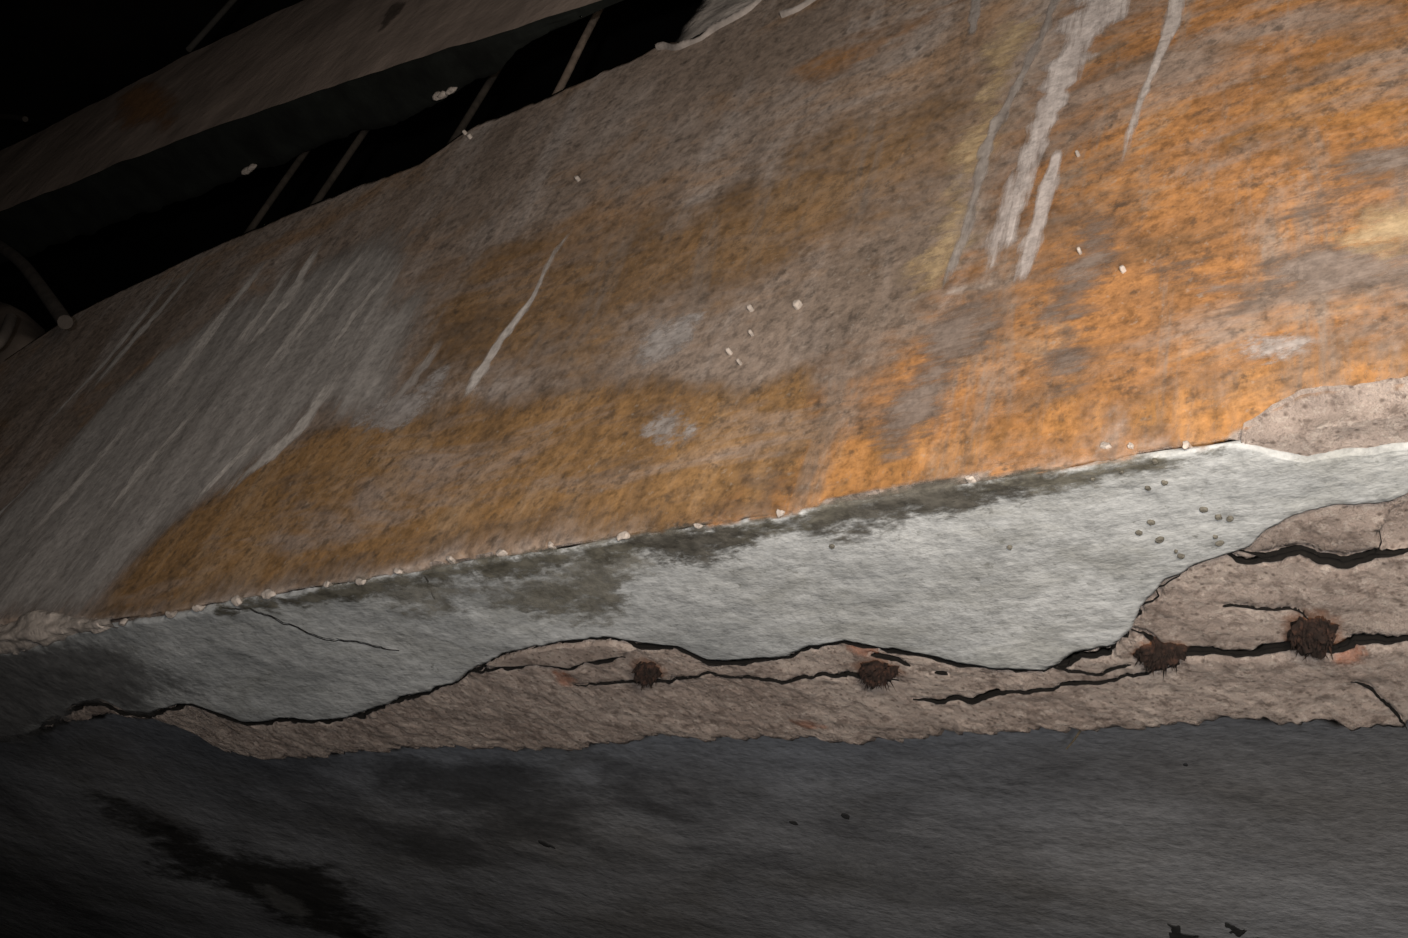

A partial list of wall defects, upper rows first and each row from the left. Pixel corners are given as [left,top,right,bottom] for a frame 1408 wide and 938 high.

damp [1127,0,1184,142]
damp [909,0,1128,290]
corrosion [99,0,1408,615]
damp [1039,227,1115,330]
flaking render [0,376,1408,760]
crack [4,531,1408,739]
corrosion [855,660,903,692]
corrosion [1132,636,1191,679]
corrosion [1285,615,1340,662]